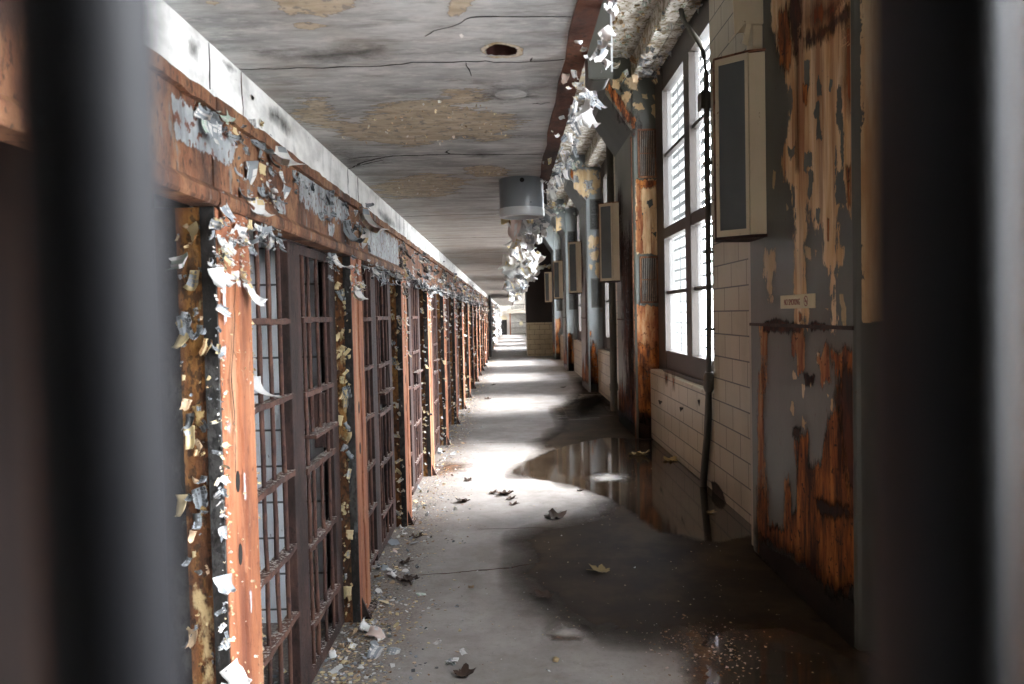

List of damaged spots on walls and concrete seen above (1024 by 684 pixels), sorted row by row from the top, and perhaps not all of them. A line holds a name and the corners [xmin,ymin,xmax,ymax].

crack [282,58,565,76]
crack [426,16,567,36]
peeling [770,0,868,335]
peeling [169,0,685,483]
corrosion [618,179,659,438]
peeling [762,247,777,302]
leakage [538,380,654,452]
peeling [790,370,833,430]
peeling [177,376,252,684]
peeling [341,499,354,615]
peeling [395,458,405,519]
leakage [506,497,870,667]